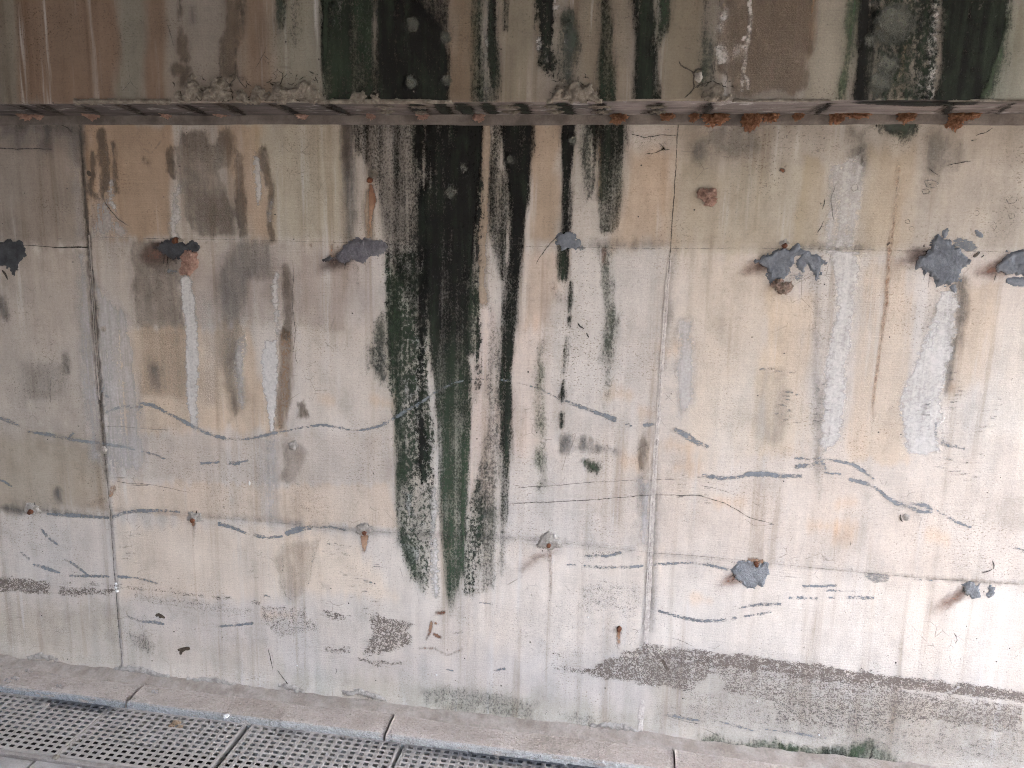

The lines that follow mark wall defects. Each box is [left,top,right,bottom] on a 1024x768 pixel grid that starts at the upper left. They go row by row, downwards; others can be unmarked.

damp [553,0,582,82]
damp [159,271,199,429]
damp [166,132,274,247]
damp [261,267,308,431]
rust [364,184,377,239]
damp [321,0,536,595]
damp [556,245,570,283]
damp [598,247,619,385]
damp [820,147,864,449]
damp [899,279,966,454]
peeling [1006,277,1024,287]
damp [551,653,1023,762]